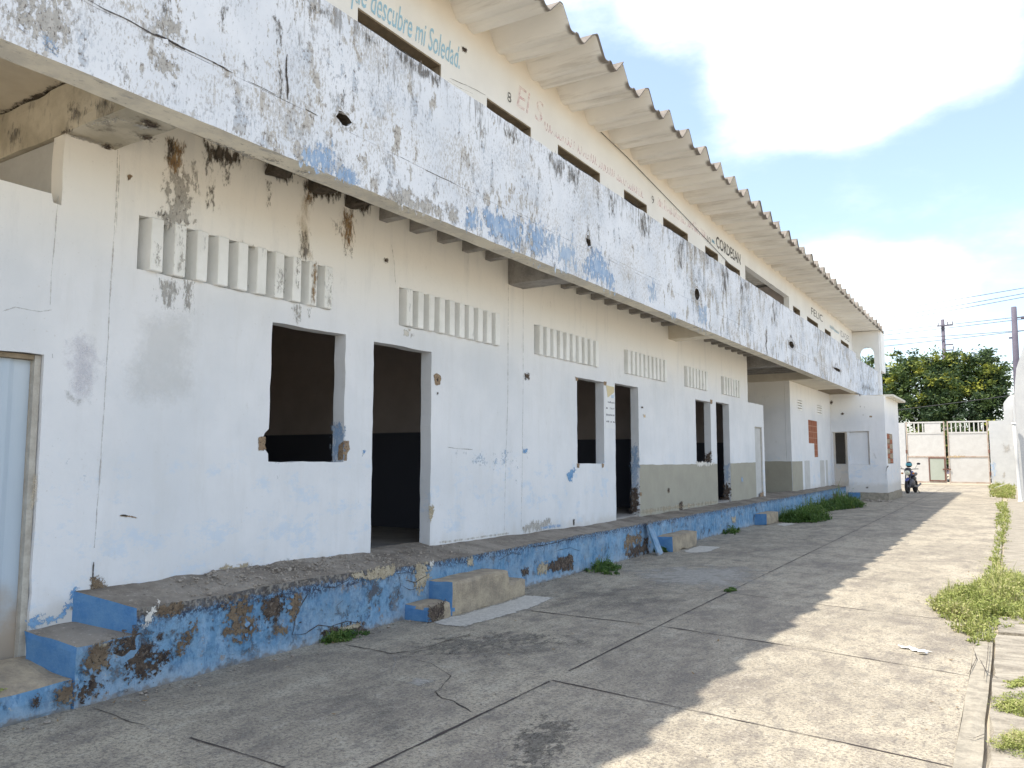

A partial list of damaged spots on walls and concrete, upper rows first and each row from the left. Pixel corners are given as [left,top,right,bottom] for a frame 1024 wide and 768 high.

crack [89,0,318,116]
damp [191,138,281,207]
peeling [393,187,615,295]
damp [159,243,195,310]
peeling [693,281,710,333]
peeling [330,422,350,462]
peeling [629,443,642,514]
spalling [352,563,395,583]
spalling [521,553,574,576]
spalling [624,529,650,559]
spalling [220,590,303,648]
spalling [28,599,201,710]